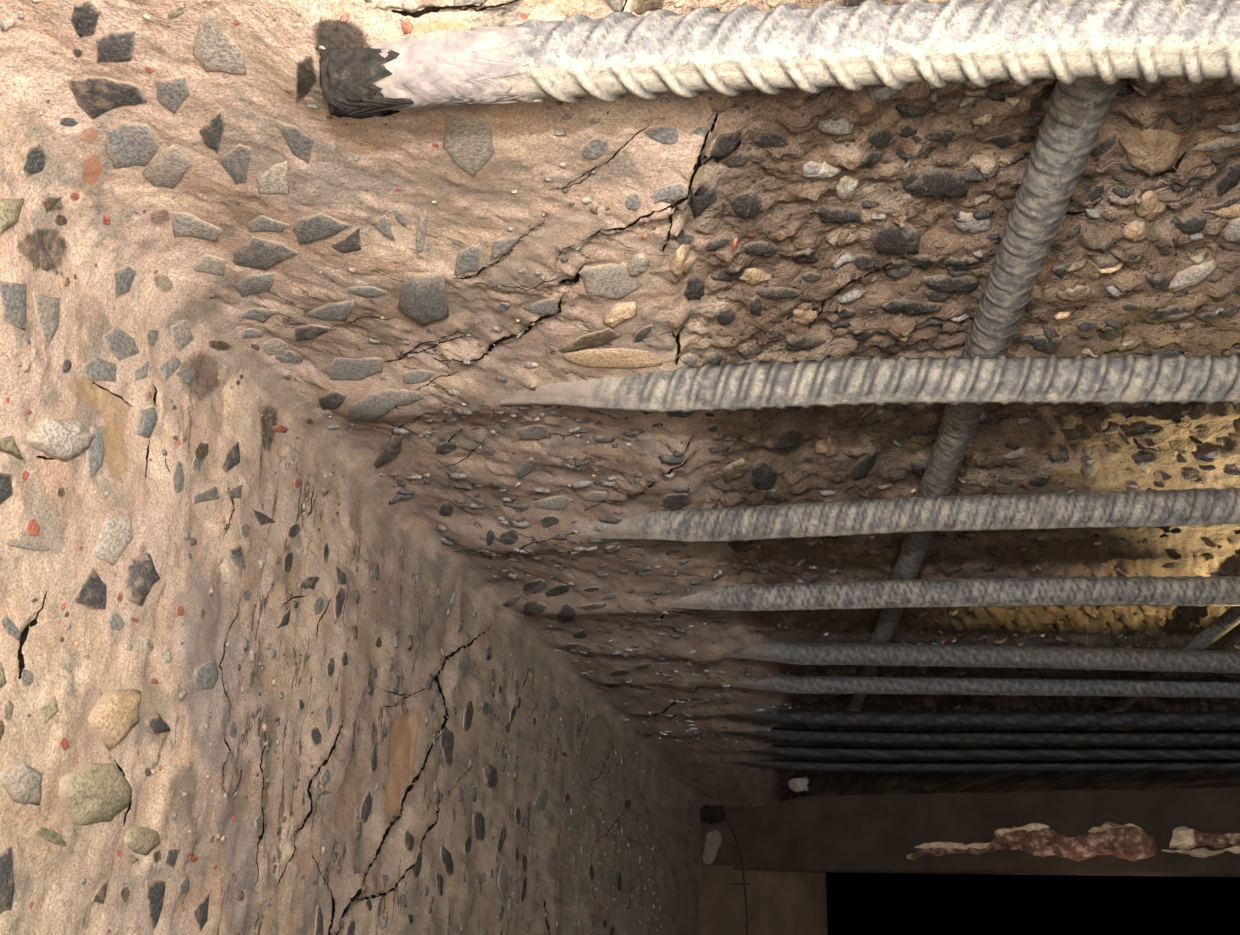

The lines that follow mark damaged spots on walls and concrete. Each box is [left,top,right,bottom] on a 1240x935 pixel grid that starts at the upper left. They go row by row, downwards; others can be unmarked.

crack [391,0,517,18]
crack [381,111,742,450]
crack [438,429,590,469]
crack [18,591,47,679]
crack [219,593,490,935]